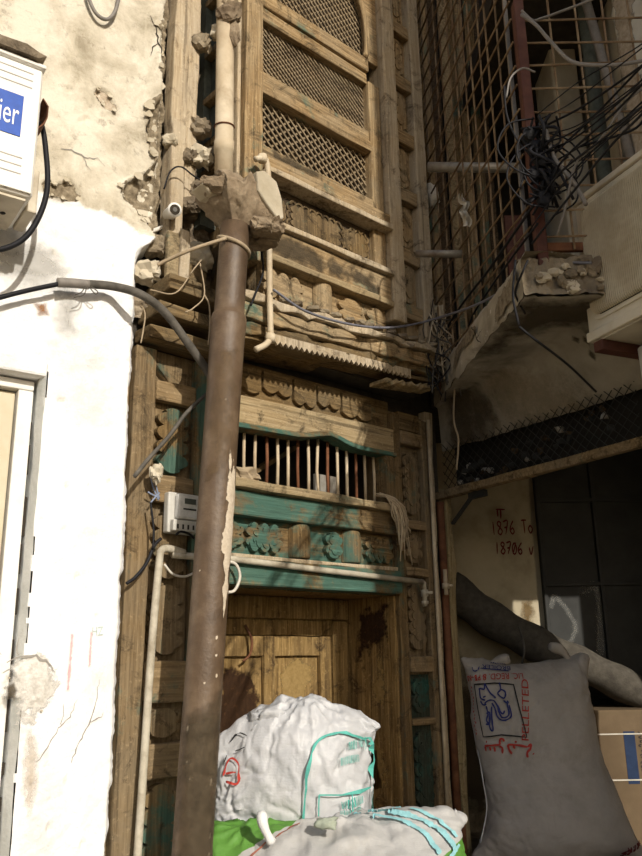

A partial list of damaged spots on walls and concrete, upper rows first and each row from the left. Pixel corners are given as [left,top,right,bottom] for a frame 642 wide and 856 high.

peeling [94,86,117,112]
spalling [117,0,169,235]
spalling [42,177,81,202]